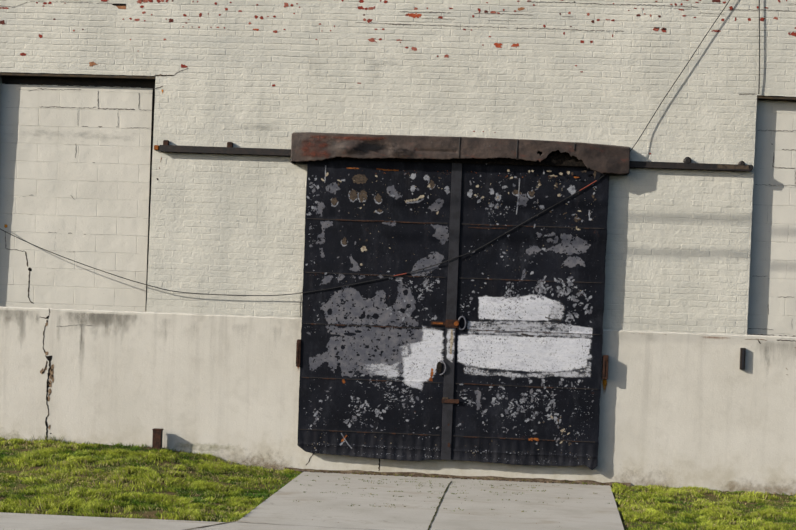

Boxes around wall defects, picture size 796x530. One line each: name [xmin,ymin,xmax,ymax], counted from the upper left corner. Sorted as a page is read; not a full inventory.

spalling [101,0,173,21]
peeling [358,0,388,42]
peeling [316,174,402,258]
peeling [410,173,435,192]
peeling [428,186,450,211]
peeling [513,190,535,206]
peeling [526,232,591,268]
peeling [309,224,449,378]
crack [5,232,92,438]